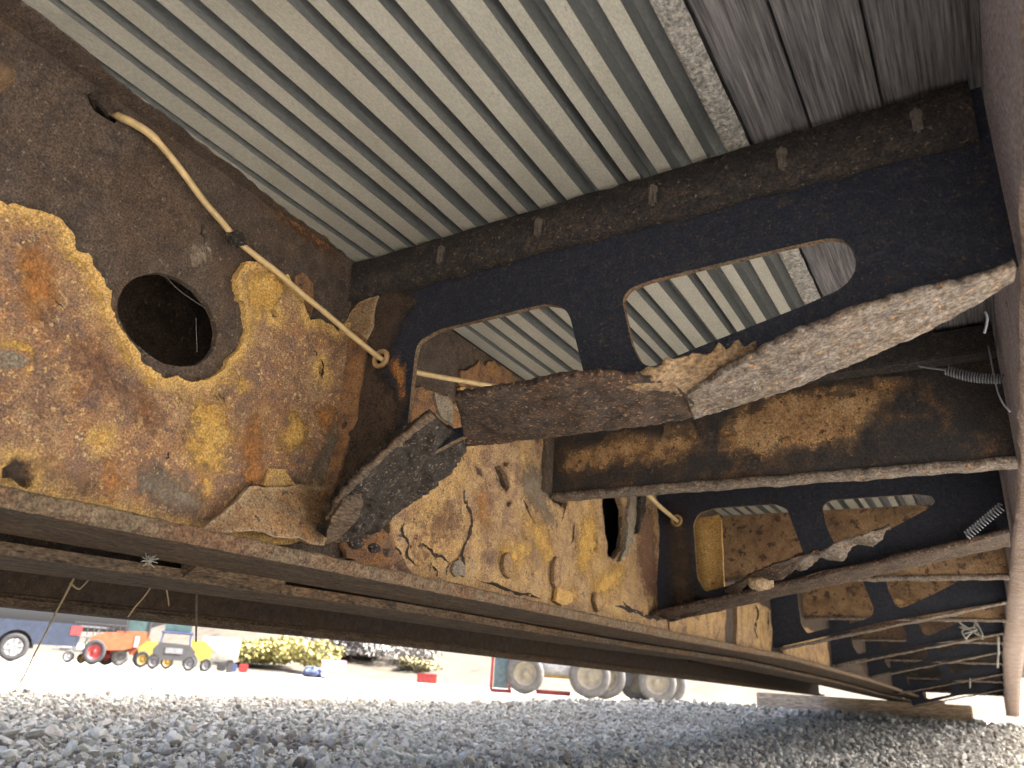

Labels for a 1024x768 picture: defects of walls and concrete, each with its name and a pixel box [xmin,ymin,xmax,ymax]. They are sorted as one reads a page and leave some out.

rust [0,201,903,667]
crack [395,478,539,598]